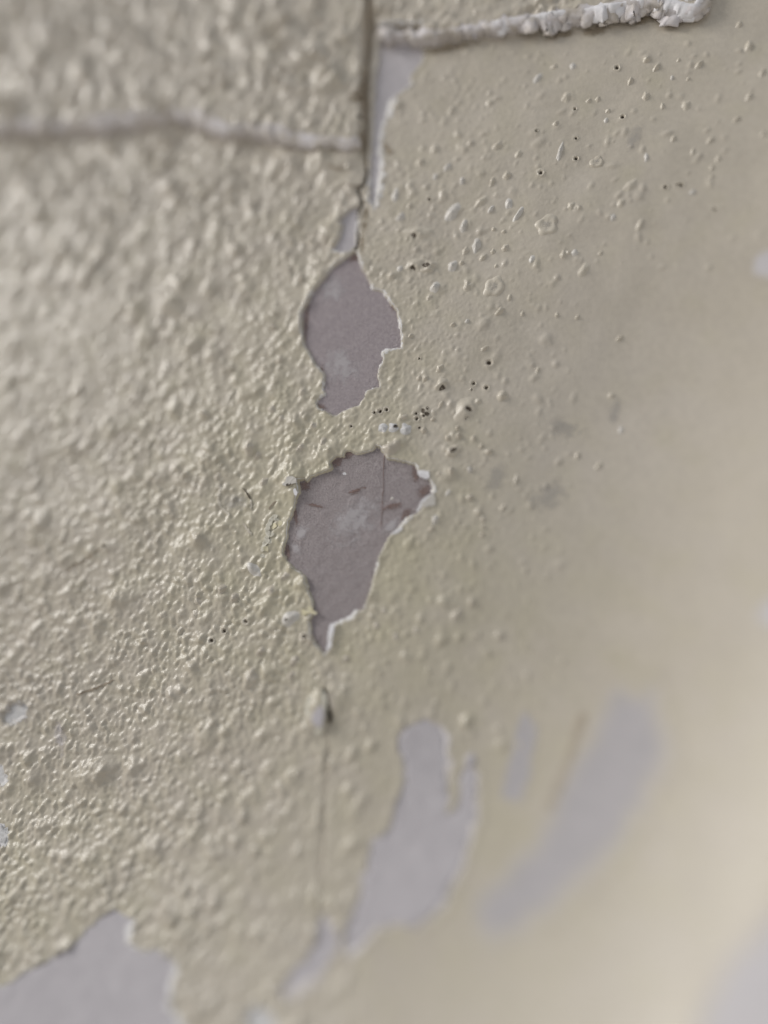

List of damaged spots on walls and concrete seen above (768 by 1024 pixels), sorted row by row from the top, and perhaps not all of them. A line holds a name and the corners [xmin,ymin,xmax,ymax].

crack [329,0,393,251]
peeling [299,20,425,416]
peeling [260,444,437,655]
peeling [340,717,481,960]
peeling [0,909,184,1024]